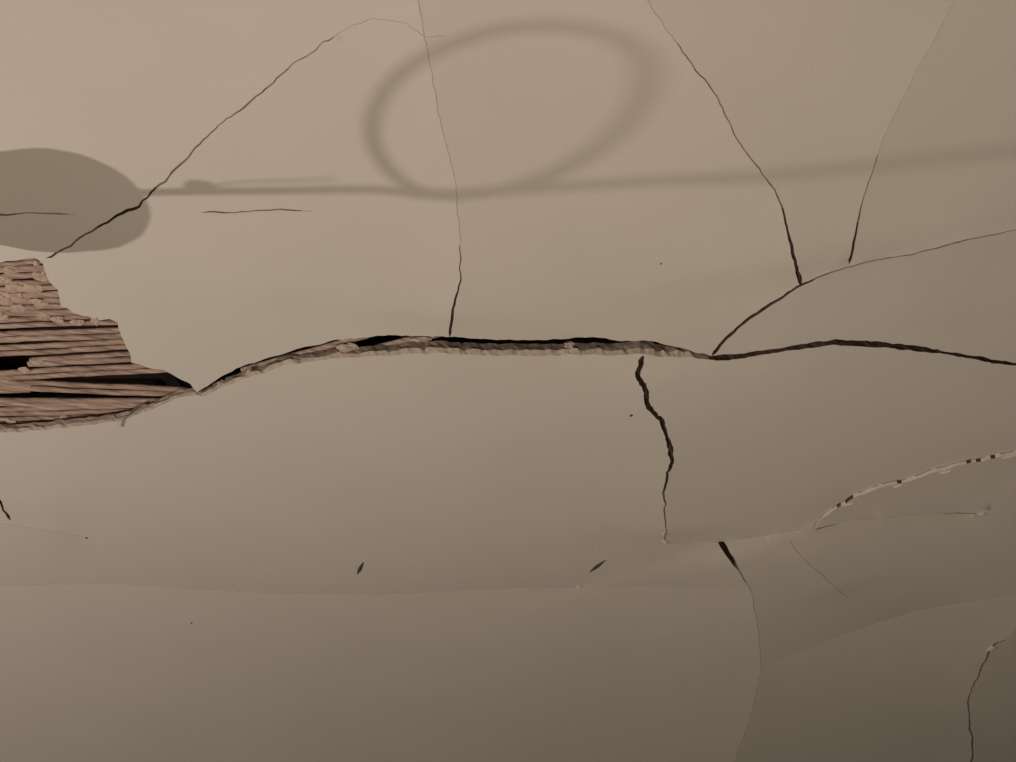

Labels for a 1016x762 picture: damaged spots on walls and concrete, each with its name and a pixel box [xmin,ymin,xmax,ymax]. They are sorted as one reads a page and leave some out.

crack [0,210,78,218]
spalling [0,258,217,433]
crack [47,0,1016,545]
crack [713,529,847,761]
crack [967,630,1015,762]